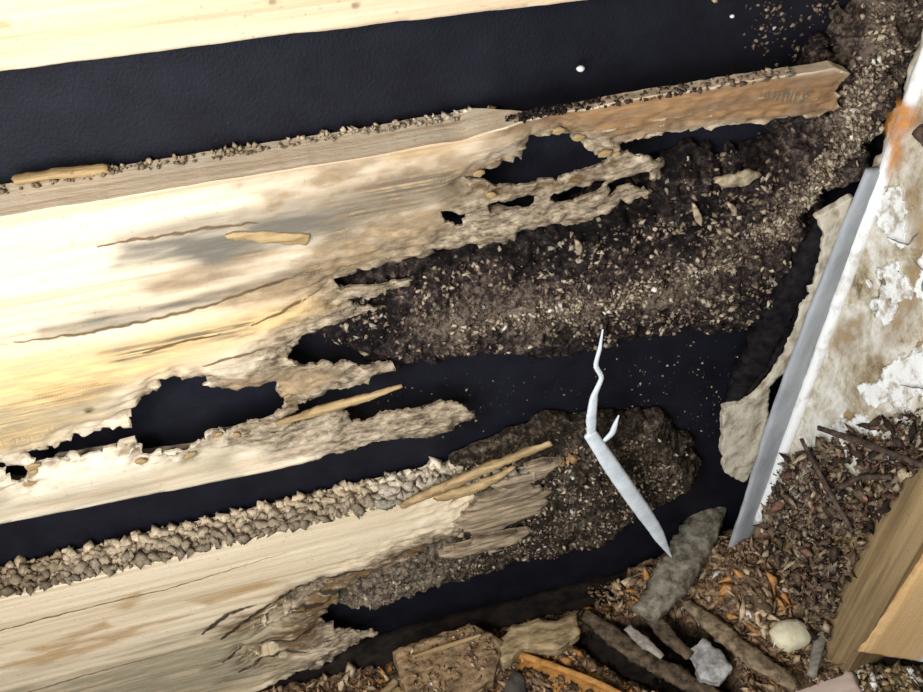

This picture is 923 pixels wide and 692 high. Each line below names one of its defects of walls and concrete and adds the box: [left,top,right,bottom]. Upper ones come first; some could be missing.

peeling [903,29,923,97]
rust [889,105,915,169]
peeling [764,92,923,542]
crack [887,233,923,291]
damp [894,256,921,322]